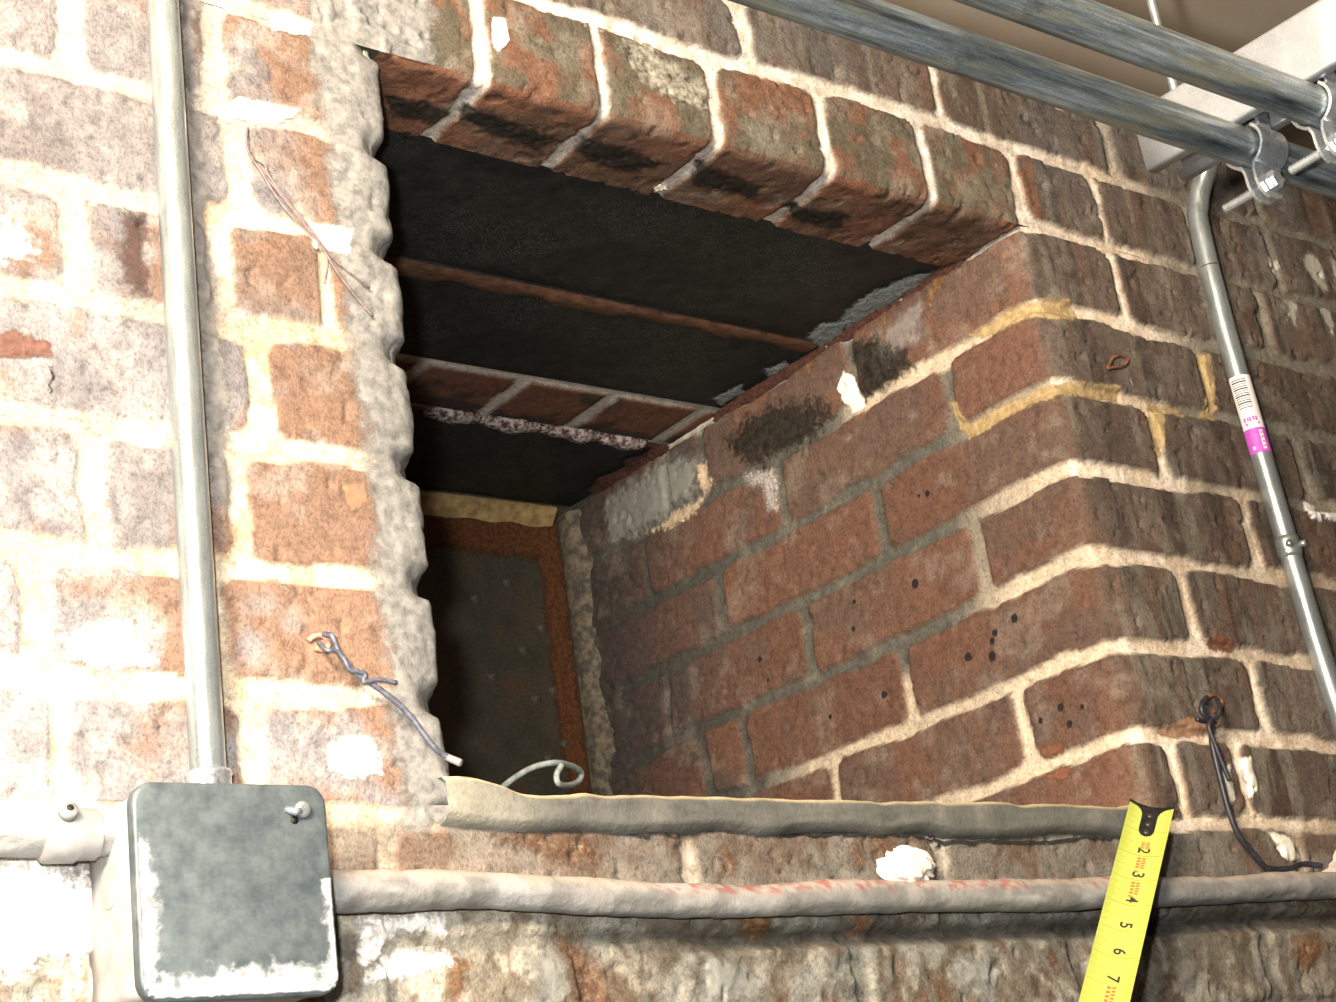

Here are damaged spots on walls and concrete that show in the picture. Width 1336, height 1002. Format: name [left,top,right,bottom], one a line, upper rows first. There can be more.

water stain [1267,256,1280,276]
water stain [1303,253,1336,292]
water stain [1286,300,1298,326]
water stain [1319,308,1334,335]
water stain [1303,502,1336,522]